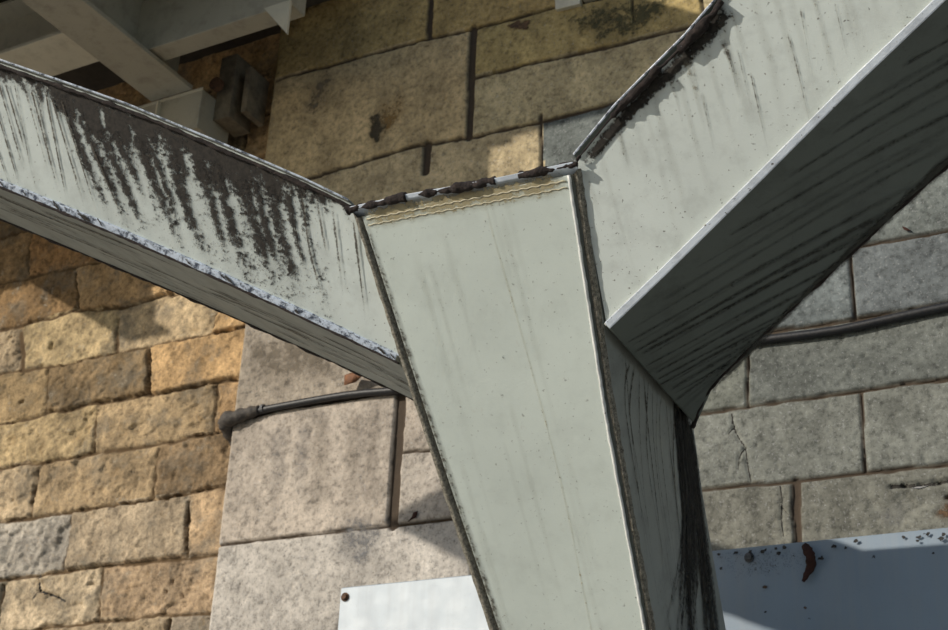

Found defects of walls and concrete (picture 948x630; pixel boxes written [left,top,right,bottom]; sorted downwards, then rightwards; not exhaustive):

water stain [0,85,411,392]
crack [730,414,751,482]
water stain [625,207,872,630]